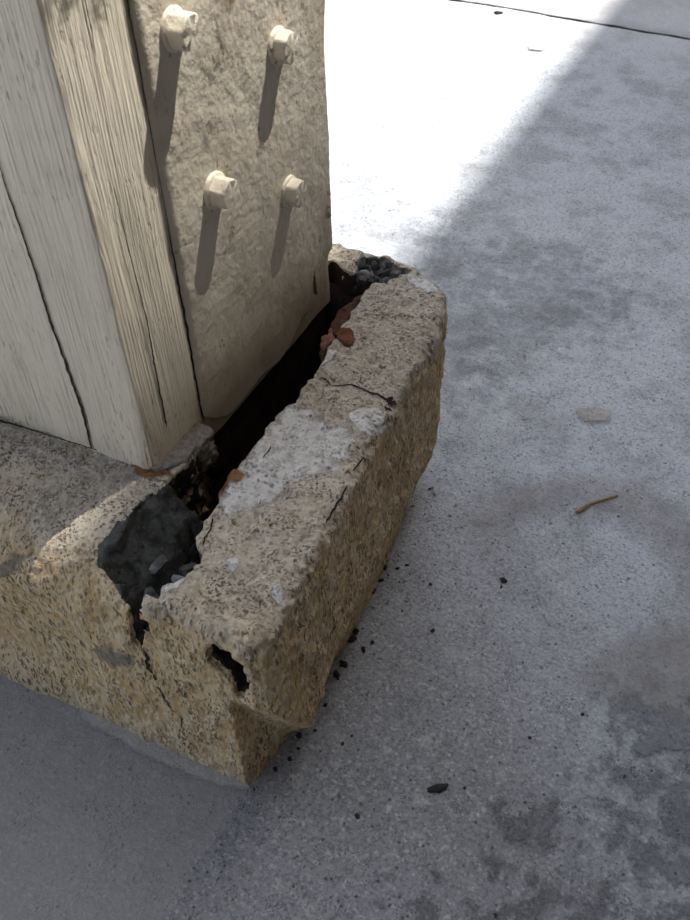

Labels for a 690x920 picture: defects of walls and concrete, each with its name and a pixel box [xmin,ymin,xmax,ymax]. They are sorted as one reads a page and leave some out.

crack [84,0,96,55]
crack [0,168,96,450]
crack [114,189,167,427]
corrosion [319,327,355,363]
crack [319,377,397,426]
spalling [97,478,204,645]
spalling [211,644,250,692]